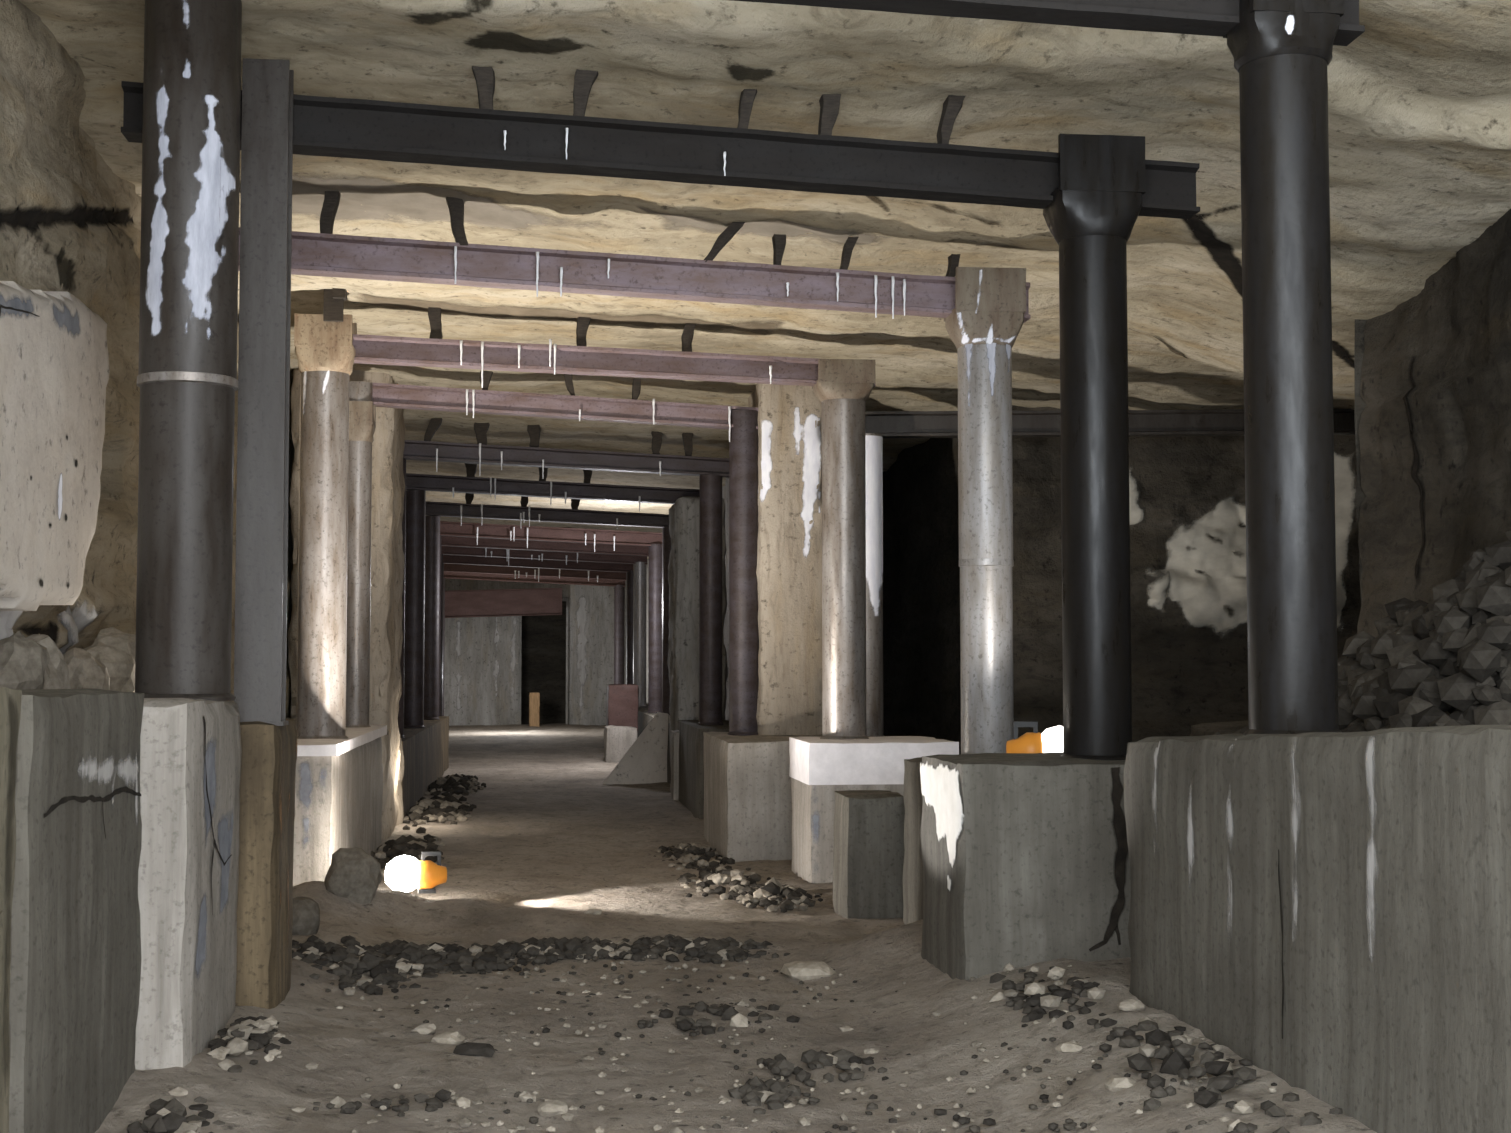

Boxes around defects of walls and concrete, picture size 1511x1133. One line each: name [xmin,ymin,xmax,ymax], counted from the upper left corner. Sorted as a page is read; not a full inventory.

crack [0,304,40,317]
water stain [760,420,773,501]
water stain [793,407,821,557]
spalling [0,583,98,654]
crack [44,786,141,839]